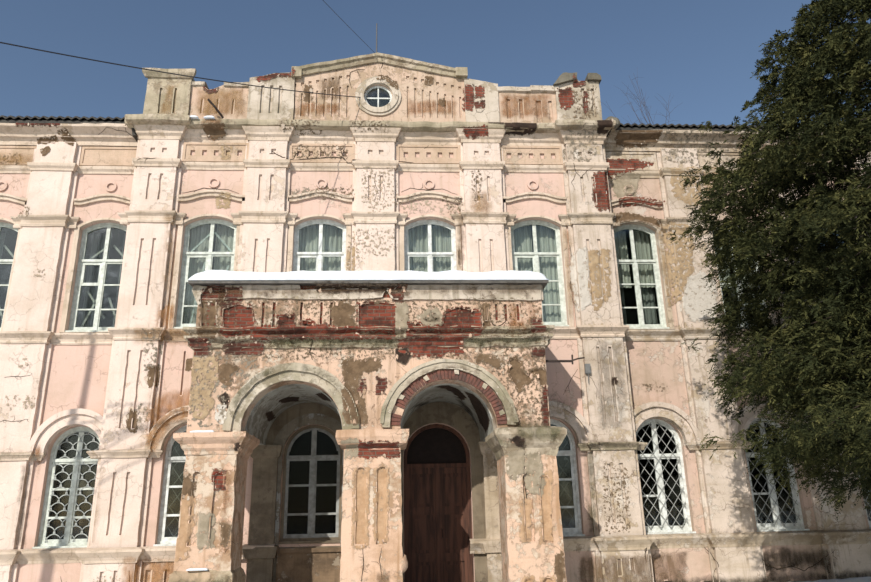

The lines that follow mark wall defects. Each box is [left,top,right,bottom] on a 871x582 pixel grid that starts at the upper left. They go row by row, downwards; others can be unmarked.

flaking render [462,84,486,111]
peeling [557,74,742,322]
peeling [346,227,396,271]
peeling [126,403,150,433]
flaking render [185,281,555,551]
peeling [175,473,232,562]
flaking render [521,551,566,582]
water stain [581,554,686,582]
water stain [696,548,871,582]
crack [762,551,836,571]